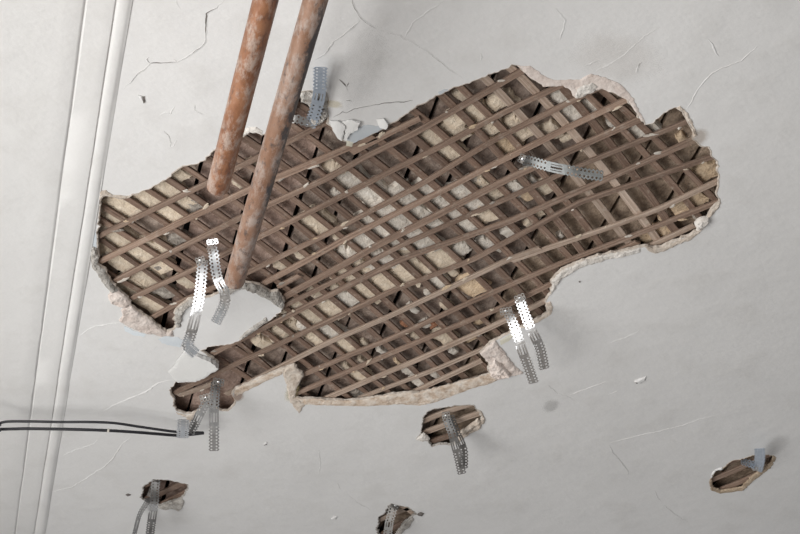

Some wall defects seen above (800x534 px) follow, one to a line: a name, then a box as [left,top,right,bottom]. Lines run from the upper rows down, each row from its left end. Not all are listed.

crack [124,0,224,88]
crack [311,0,463,79]
flaking render [91,64,721,447]
flaking render [126,479,189,511]
flaking render [375,503,424,534]
flaking render [709,455,776,494]